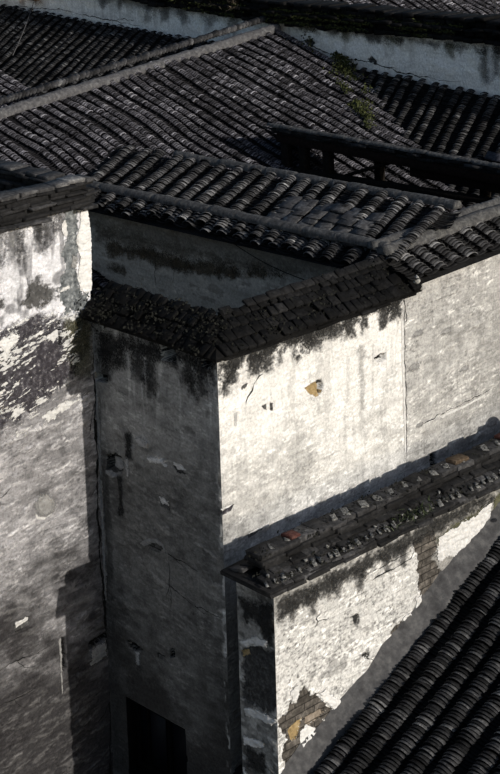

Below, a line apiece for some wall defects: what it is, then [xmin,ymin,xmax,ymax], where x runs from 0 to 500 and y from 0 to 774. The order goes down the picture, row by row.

damp [327,24,470,58]
damp [66,299,408,404]
spalling [305,380,326,401]
crack [401,301,495,466]
crack [89,354,108,649]
damp [238,494,500,646]
damp [244,746,266,774]
spalling [240,636,341,763]